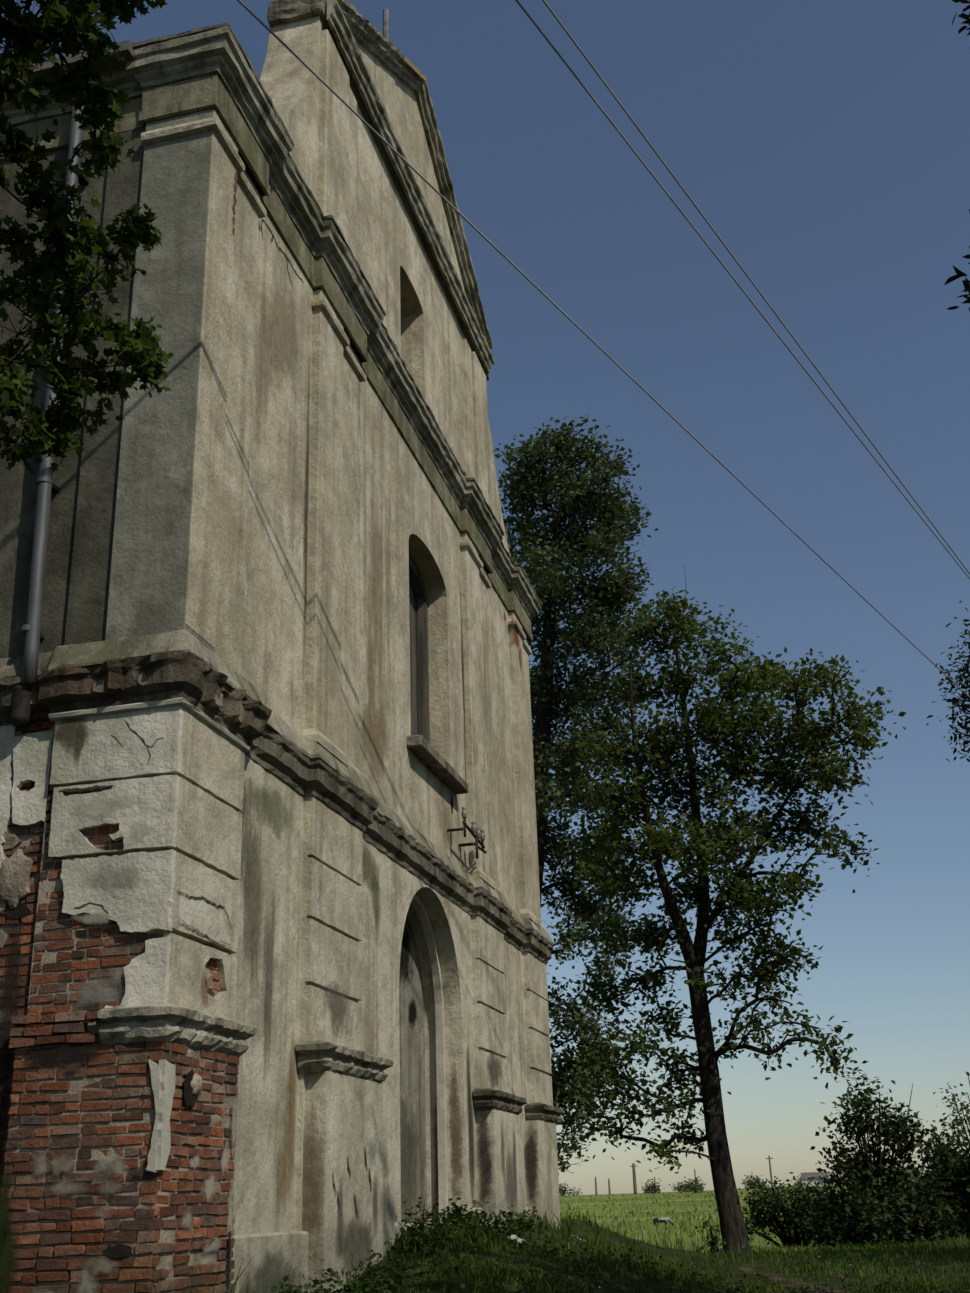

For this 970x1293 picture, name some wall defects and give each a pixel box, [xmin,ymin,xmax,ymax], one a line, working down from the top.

flaking render [16,721,56,751]
crack [111,721,162,764]
flaking render [0,781,239,1293]
leakage [488,1056,500,1085]
leakage [400,1102,417,1198]
leakage [467,1063,538,1205]